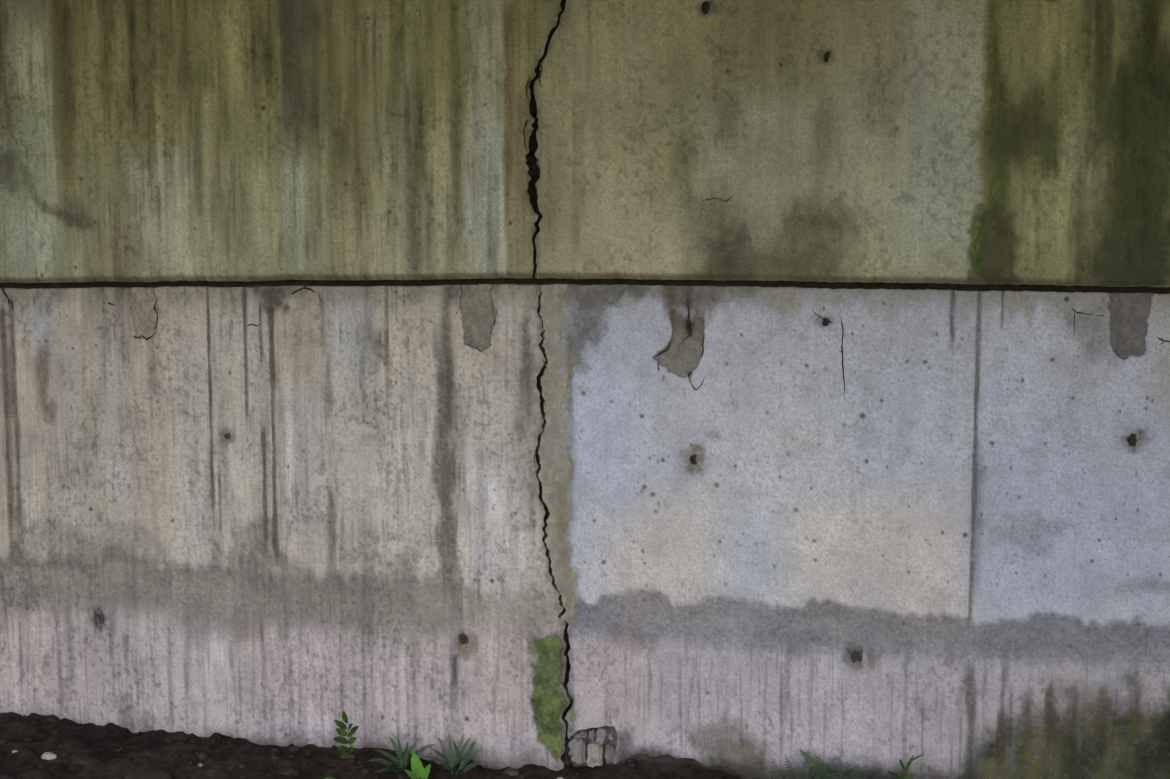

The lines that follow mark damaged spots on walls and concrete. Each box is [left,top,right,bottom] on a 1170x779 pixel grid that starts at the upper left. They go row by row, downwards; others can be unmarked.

peeling [130,287,158,340]
peeling [450,284,497,352]
crack [523,0,574,768]
peeling [653,286,705,391]
peeling [1109,293,1153,360]
damp [521,284,696,635]
damp [755,292,1170,658]
damp [624,748,678,765]
damp [696,764,906,779]
damp [958,671,975,779]